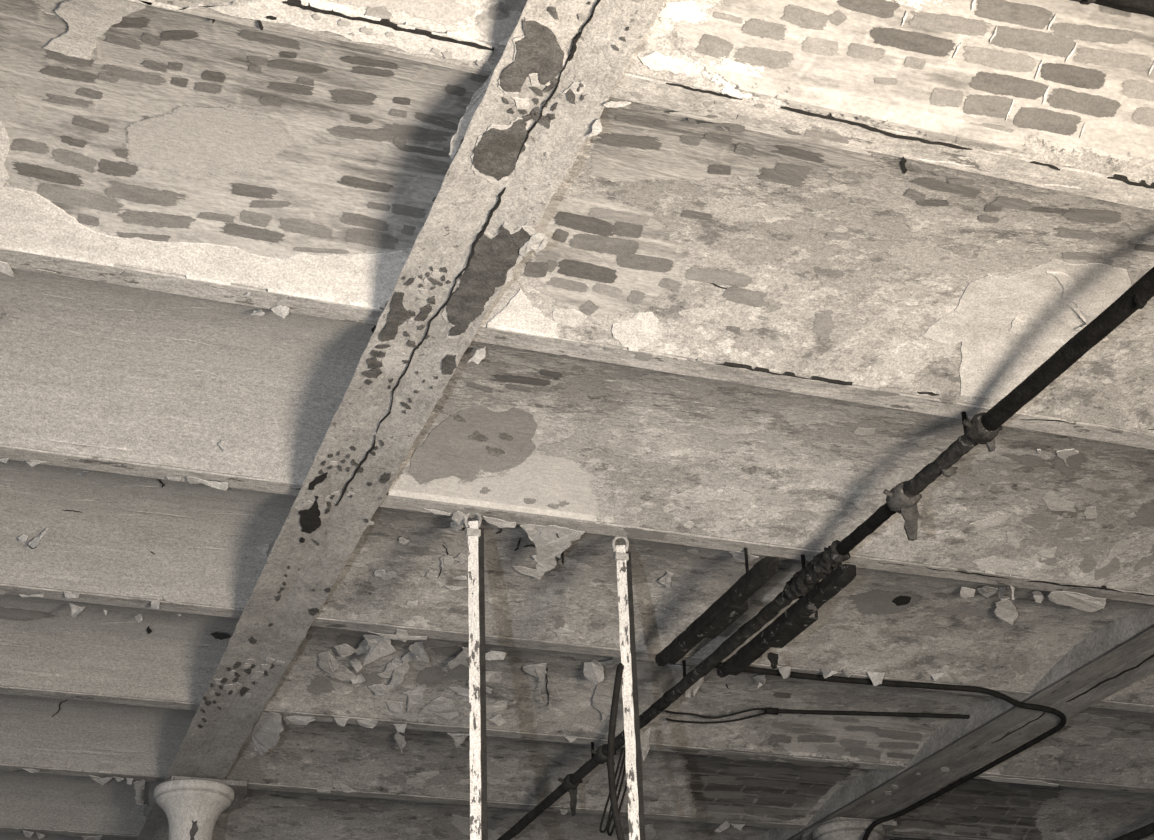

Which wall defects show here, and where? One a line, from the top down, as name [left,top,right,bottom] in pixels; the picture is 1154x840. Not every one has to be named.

crack [282,0,494,51]
flaking render [0,0,492,258]
crack [337,0,601,505]
flaking render [519,193,768,319]
crack [630,83,972,150]
flaking render [583,0,1154,187]
flaking render [900,157,1124,260]
crack [1030,161,1060,171]
crack [1107,174,1154,189]
crack [582,344,939,397]
spalling [409,370,563,494]
peeling [424,506,585,580]